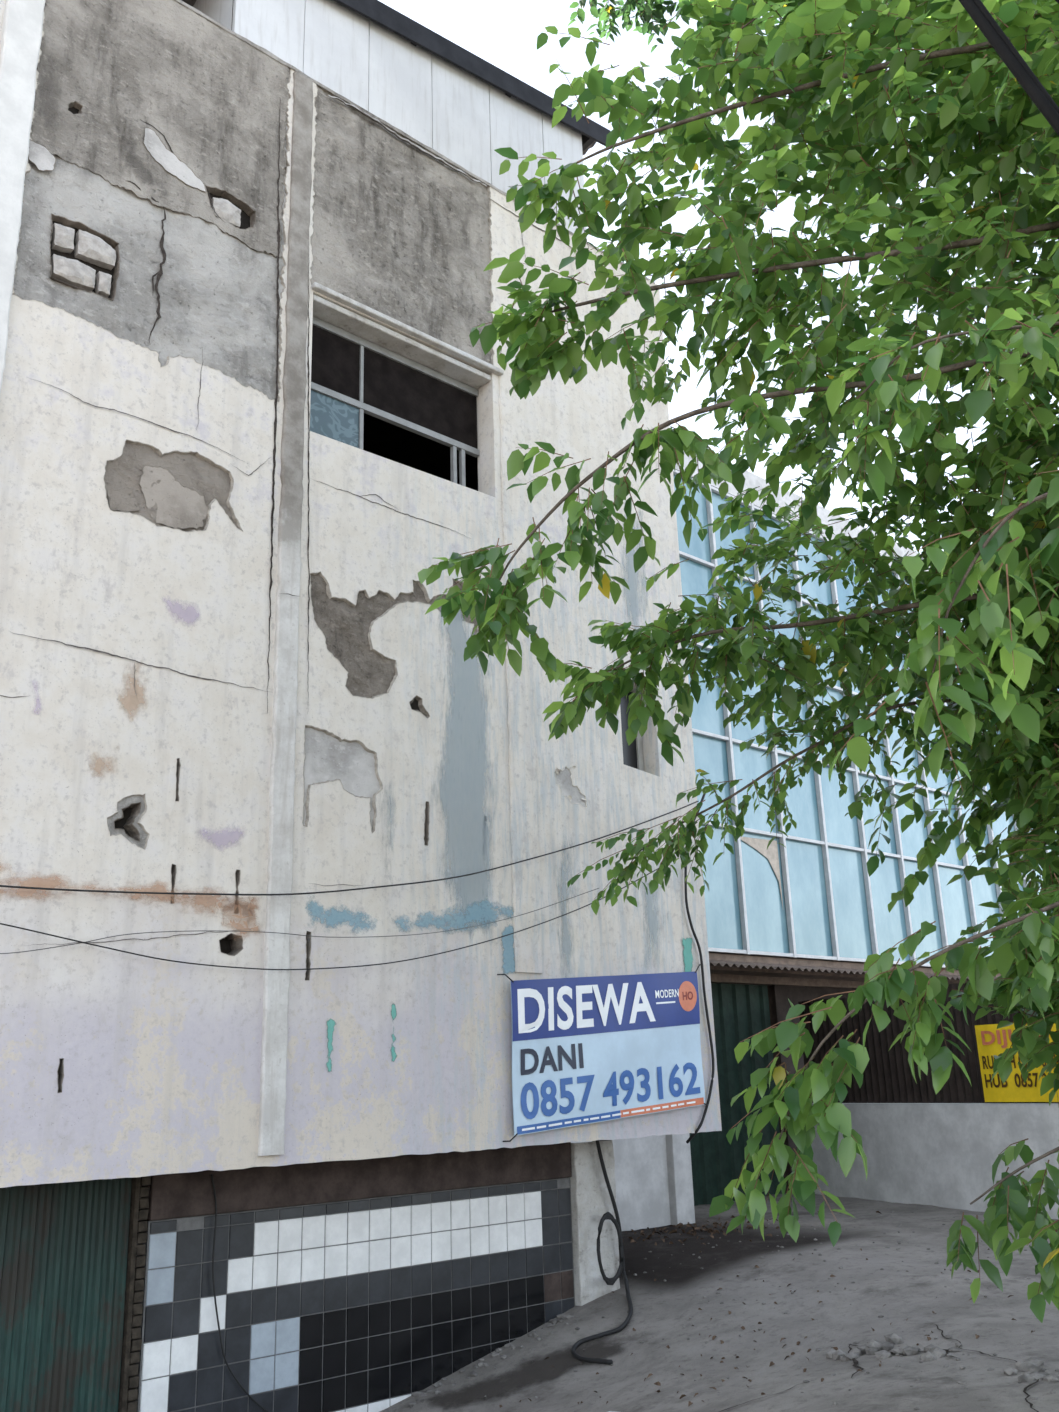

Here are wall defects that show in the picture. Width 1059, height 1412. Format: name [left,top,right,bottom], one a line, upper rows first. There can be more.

spalling [13,0,291,402]
crack [13,112,471,712]
spalling [104,439,243,532]
spalling [310,571,479,699]
spalling [107,794,150,850]
spalling [303,725,383,833]
water stain [395,610,515,974]
rust [0,877,64,897]
rust [124,884,258,934]
water stain [308,901,371,930]
crack [909,1323,1043,1371]